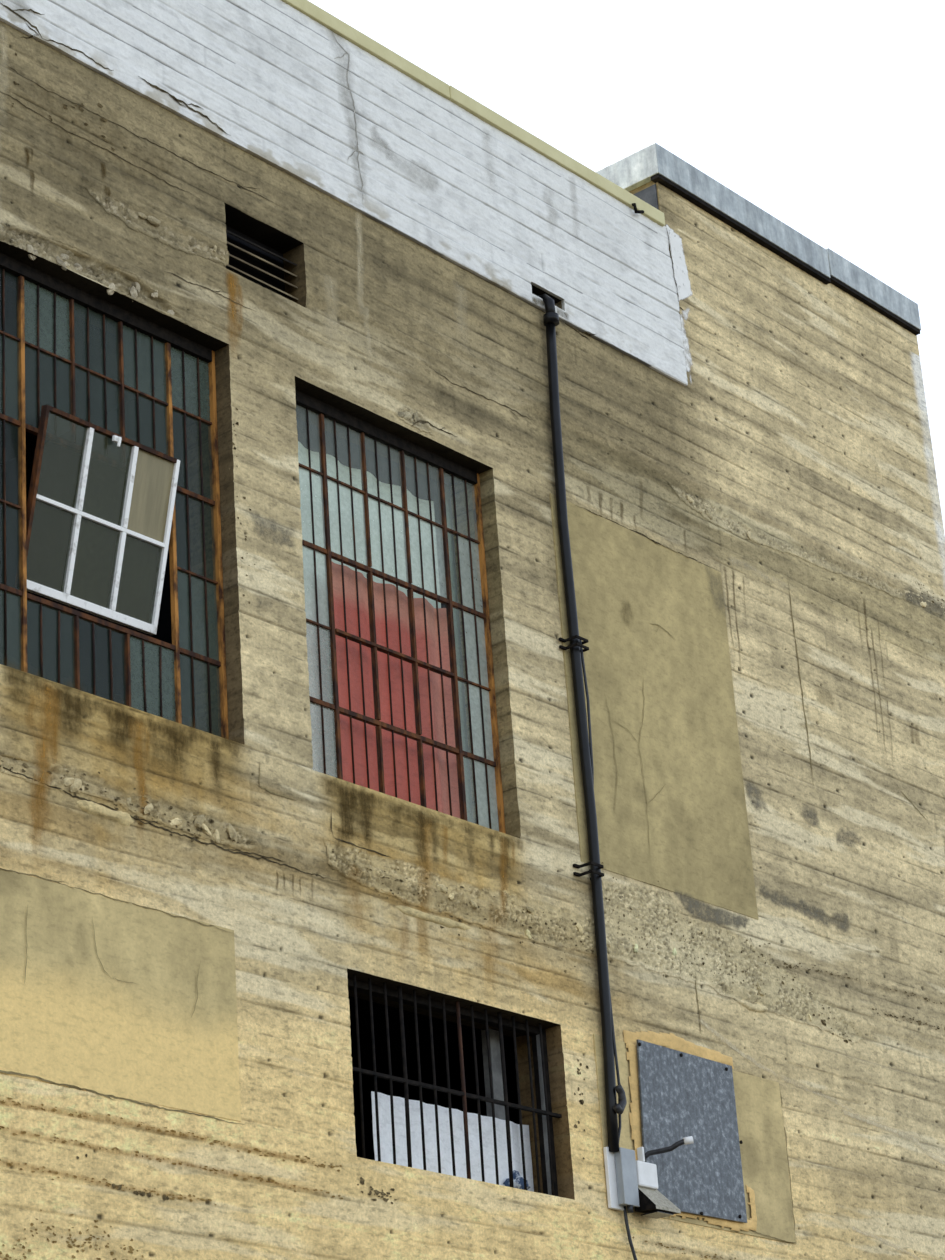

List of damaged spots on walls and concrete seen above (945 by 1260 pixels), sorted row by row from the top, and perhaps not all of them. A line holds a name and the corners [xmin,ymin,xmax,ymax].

crack [1,2,229,135]
crack [0,61,281,207]
crack [332,32,364,208]
spalling [0,222,189,325]
leakage [58,688,132,742]
spalling [0,750,257,851]
spalling [323,838,942,1045]